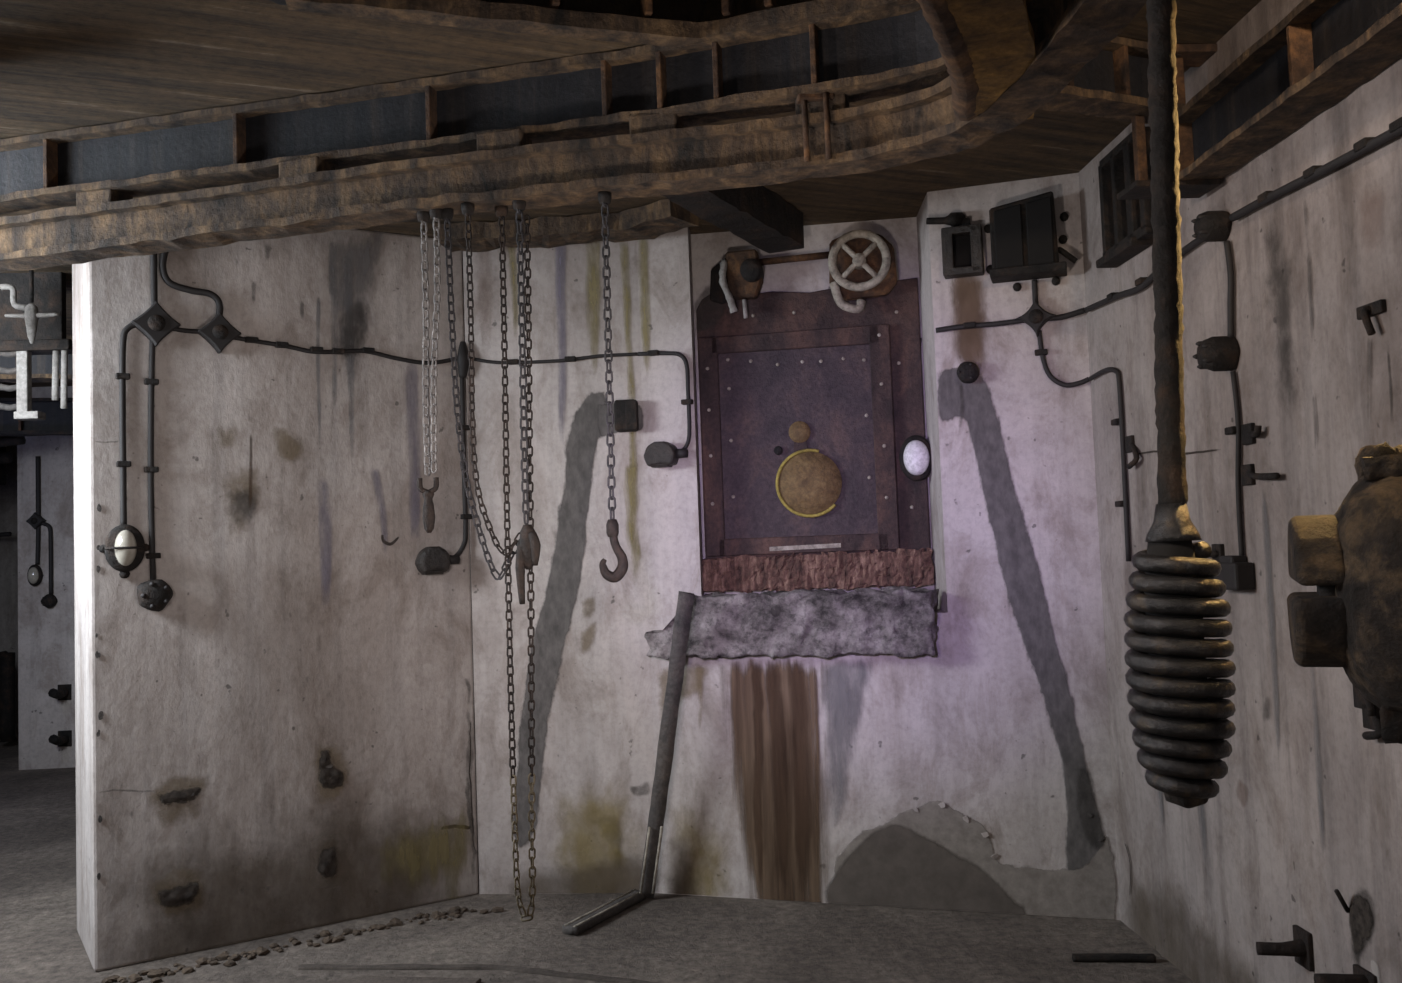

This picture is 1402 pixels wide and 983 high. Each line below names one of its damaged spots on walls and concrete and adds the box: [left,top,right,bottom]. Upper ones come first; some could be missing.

leakage [301,243,374,428]
leakage [233,437,254,515]
peeling [826,368,1116,919]
spalling [155,779,202,820]
spalling [319,750,344,797]
corrosion [730,661,822,902]
spalling [155,873,200,912]